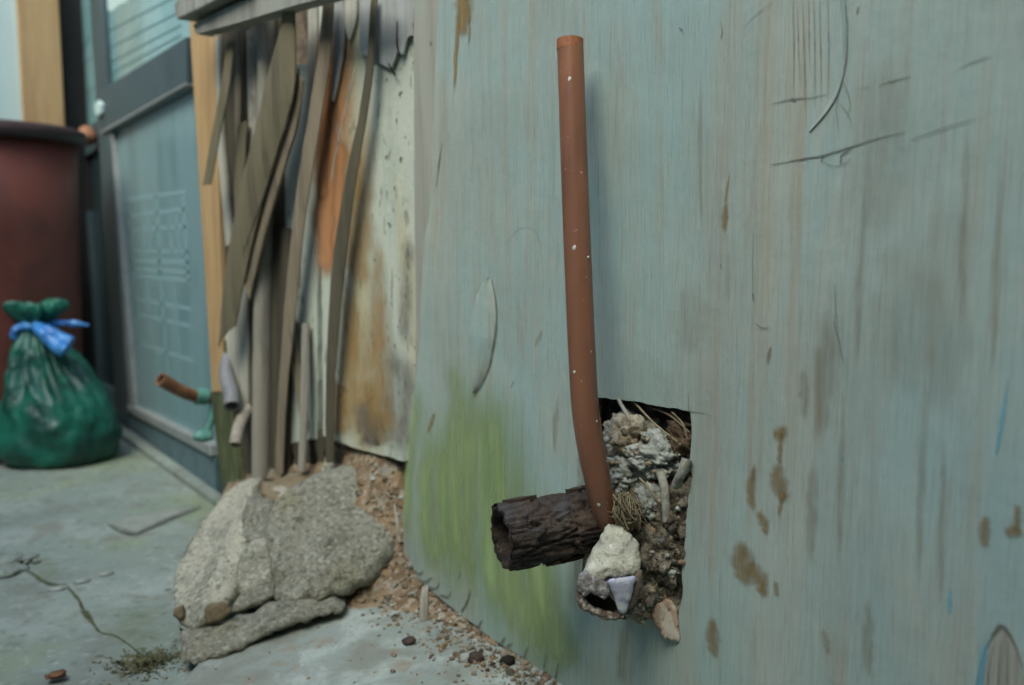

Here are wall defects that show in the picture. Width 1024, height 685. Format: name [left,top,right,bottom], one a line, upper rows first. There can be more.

crack [721,0,976,166]
corrosion [314,36,378,277]
corrosion [334,294,389,441]
spalling [601,399,680,432]
spalling [657,472,692,547]
corrosion [749,469,767,533]
corrosion [772,428,785,513]
spalling [605,568,643,620]
spalling [651,565,683,642]
corrosion [735,545,778,595]